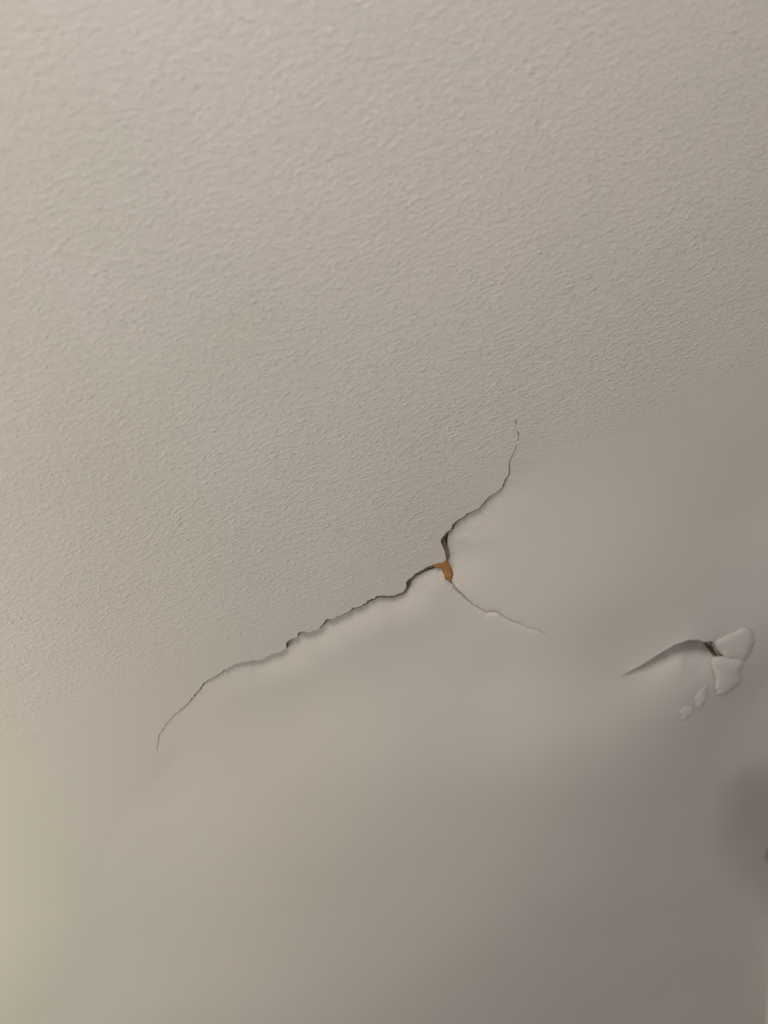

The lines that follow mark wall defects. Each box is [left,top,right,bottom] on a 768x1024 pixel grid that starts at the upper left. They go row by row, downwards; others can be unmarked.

crack [286,420,542,648]
flaking render [694,656,744,708]